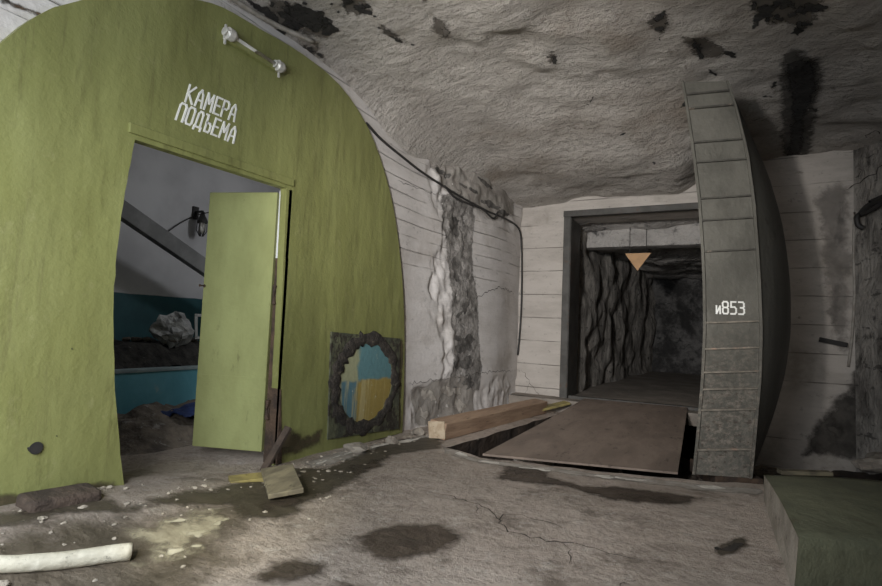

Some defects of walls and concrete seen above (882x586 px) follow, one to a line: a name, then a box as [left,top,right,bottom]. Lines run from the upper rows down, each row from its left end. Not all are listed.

water stain [787,59,817,156]
water stain [0,435,762,586]
crack [441,494,641,585]